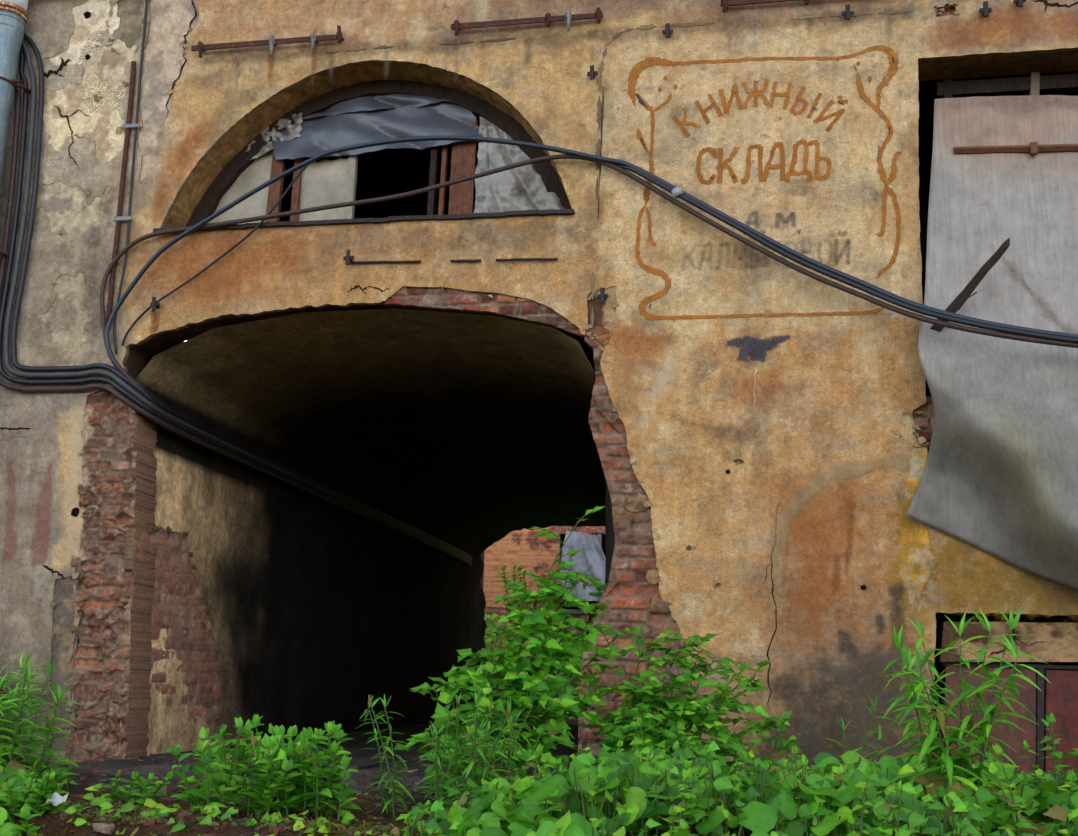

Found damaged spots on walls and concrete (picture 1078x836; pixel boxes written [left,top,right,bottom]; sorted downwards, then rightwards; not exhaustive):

crack [44,58,71,78]
crack [53,105,91,168]
peeling [43,0,199,183]
crack [163,0,197,118]
spalling [934,2,961,17]
crack [1033,0,1078,11]
spalling [43,383,222,767]
spalling [384,286,697,756]
crack [764,503,779,708]
peeling [895,396,937,605]